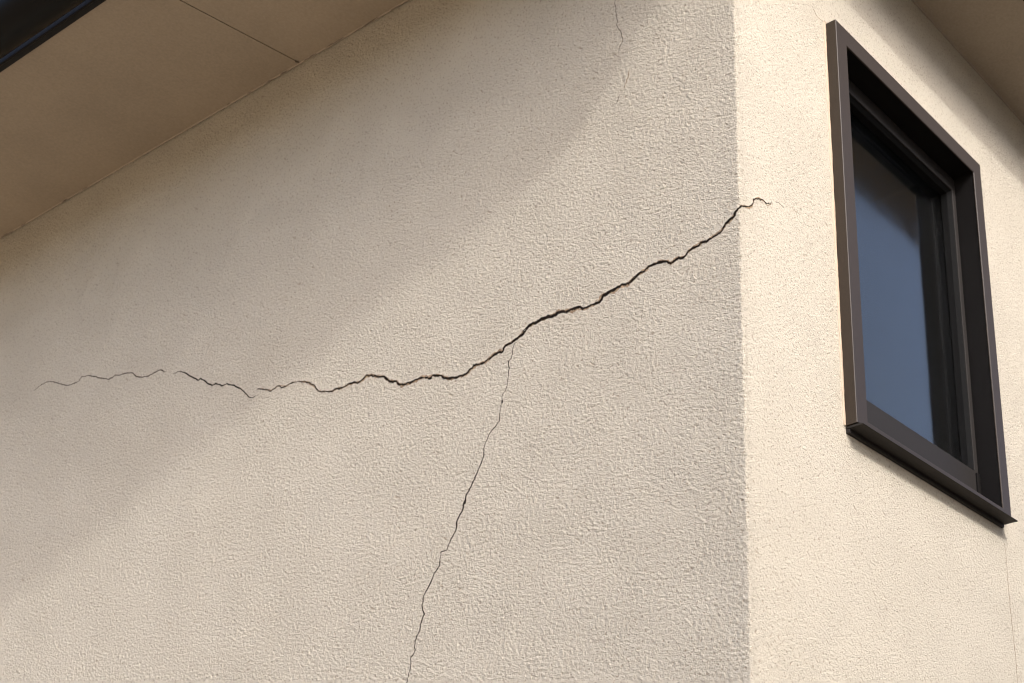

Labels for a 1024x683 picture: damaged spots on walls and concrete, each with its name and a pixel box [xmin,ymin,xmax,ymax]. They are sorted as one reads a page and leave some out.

crack [36,197,797,683]